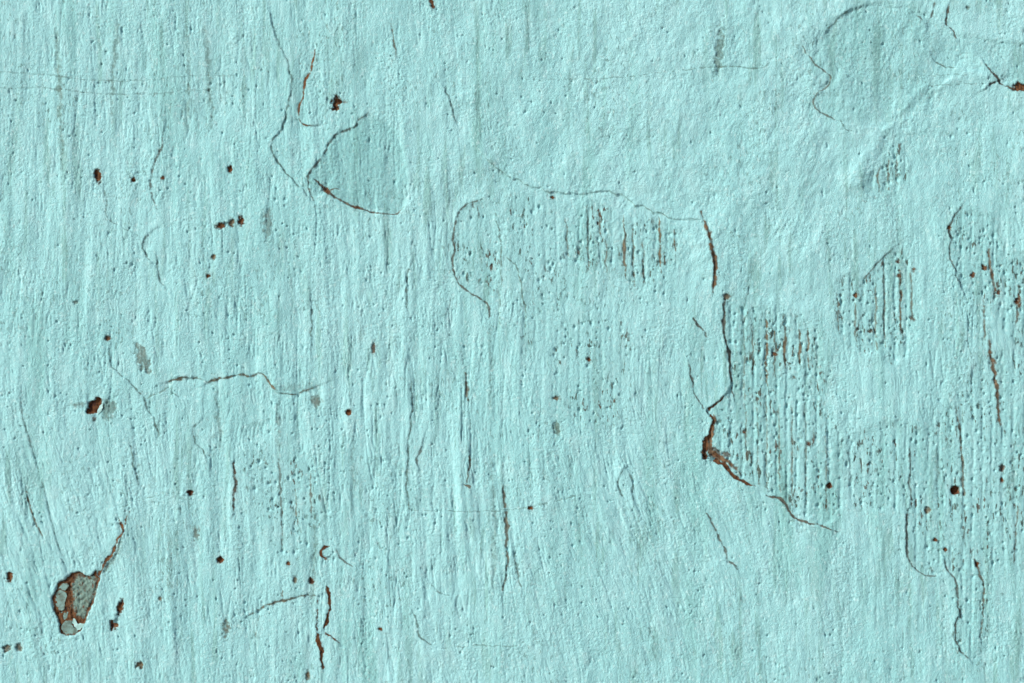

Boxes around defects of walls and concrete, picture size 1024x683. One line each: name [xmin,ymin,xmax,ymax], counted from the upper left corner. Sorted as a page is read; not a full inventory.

crack [985,64,1024,91]
crack [271,50,315,186]
crack [700,211,718,289]
crack [128,373,313,432]
crack [766,495,837,532]
spalling [52,511,130,636]
crack [250,586,339,669]